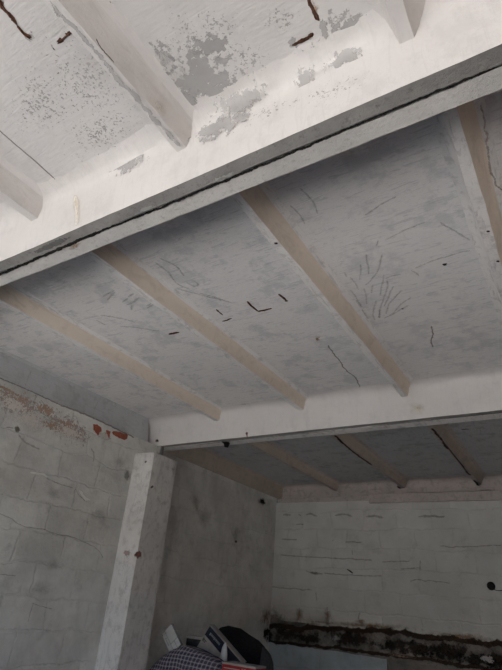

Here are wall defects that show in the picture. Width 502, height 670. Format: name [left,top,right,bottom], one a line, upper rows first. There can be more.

peeling [307,0,360,39]
peeling [149,11,290,142]
spalling [288,32,314,54]
peeling [294,68,315,87]
peeling [323,48,362,72]
peeling [110,155,143,176]
crack [0,64,502,276]
peeling [0,386,88,443]
flaking render [93,424,129,440]
damp [263,612,502,670]